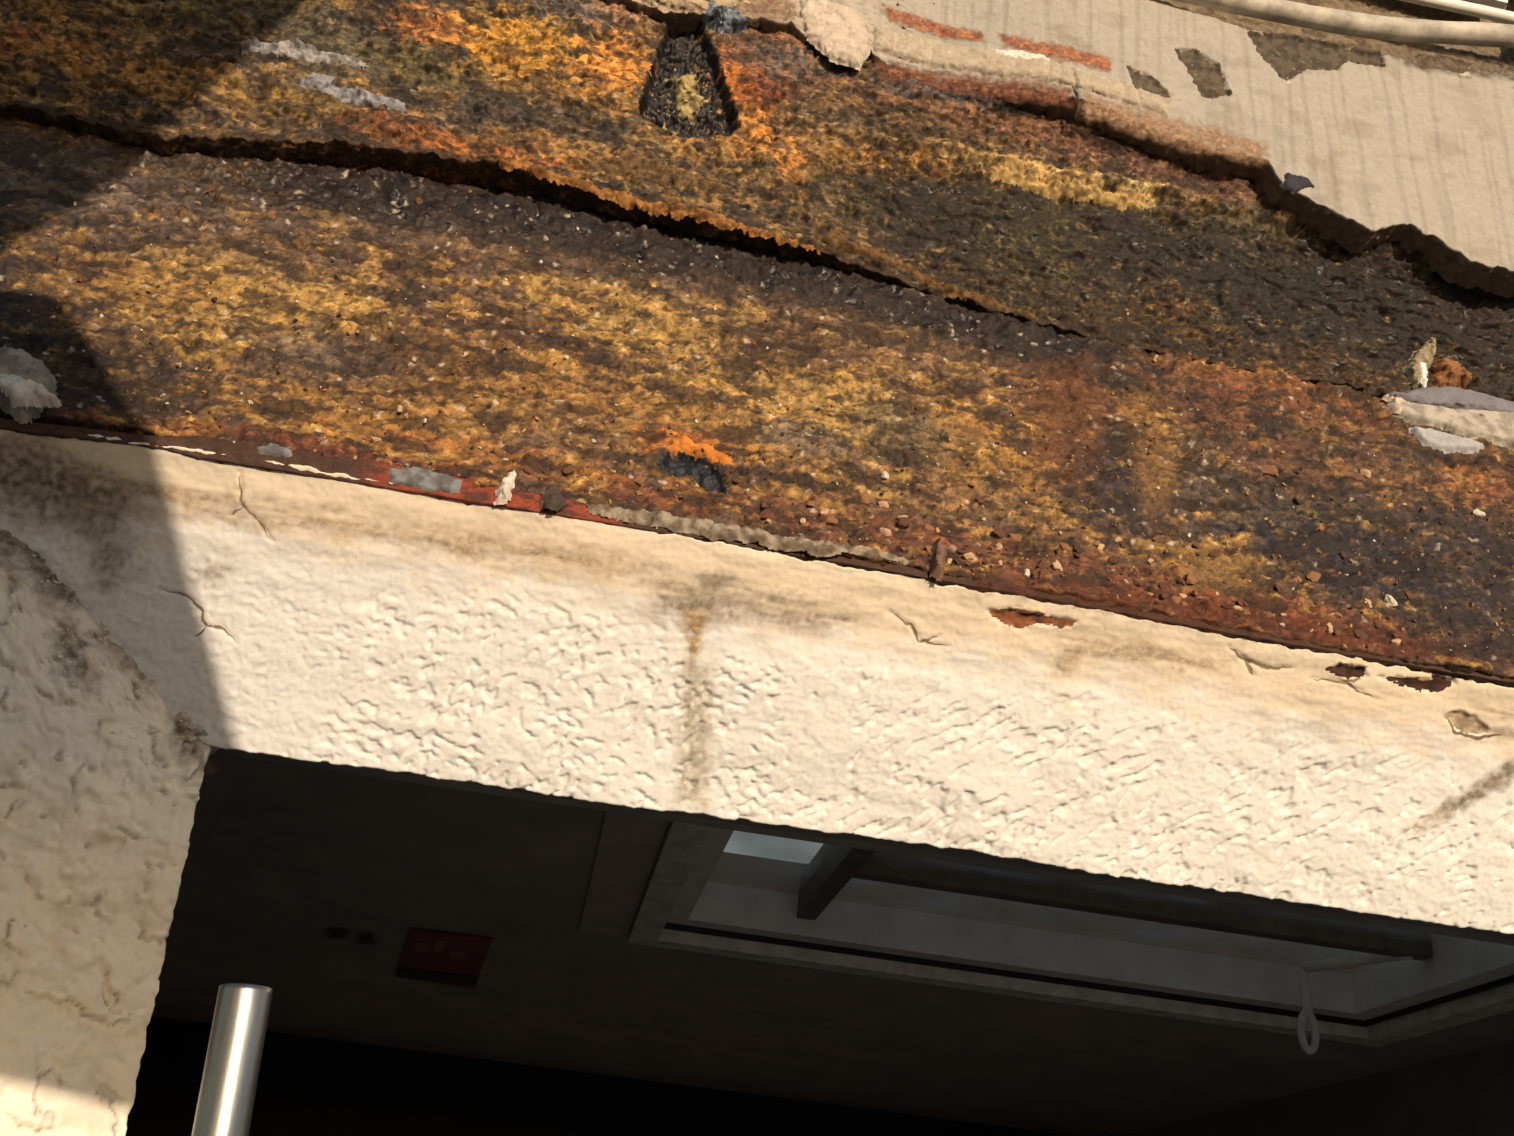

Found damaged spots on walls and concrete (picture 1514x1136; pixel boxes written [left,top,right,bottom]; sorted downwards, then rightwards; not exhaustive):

corrosion [239,36,406,113]
hole [635,21,741,139]
corrosion [886,7,1110,71]
spalling [1126,48,1232,102]
spalling [1247,30,1385,85]
corrosion [989,154,1152,212]
corrosion [496,158,1039,321]
crack [231,474,269,538]
crack [163,589,236,641]
peeling [988,605,1078,629]
peeling [1325,657,1451,693]
damp [1415,763,1514,828]